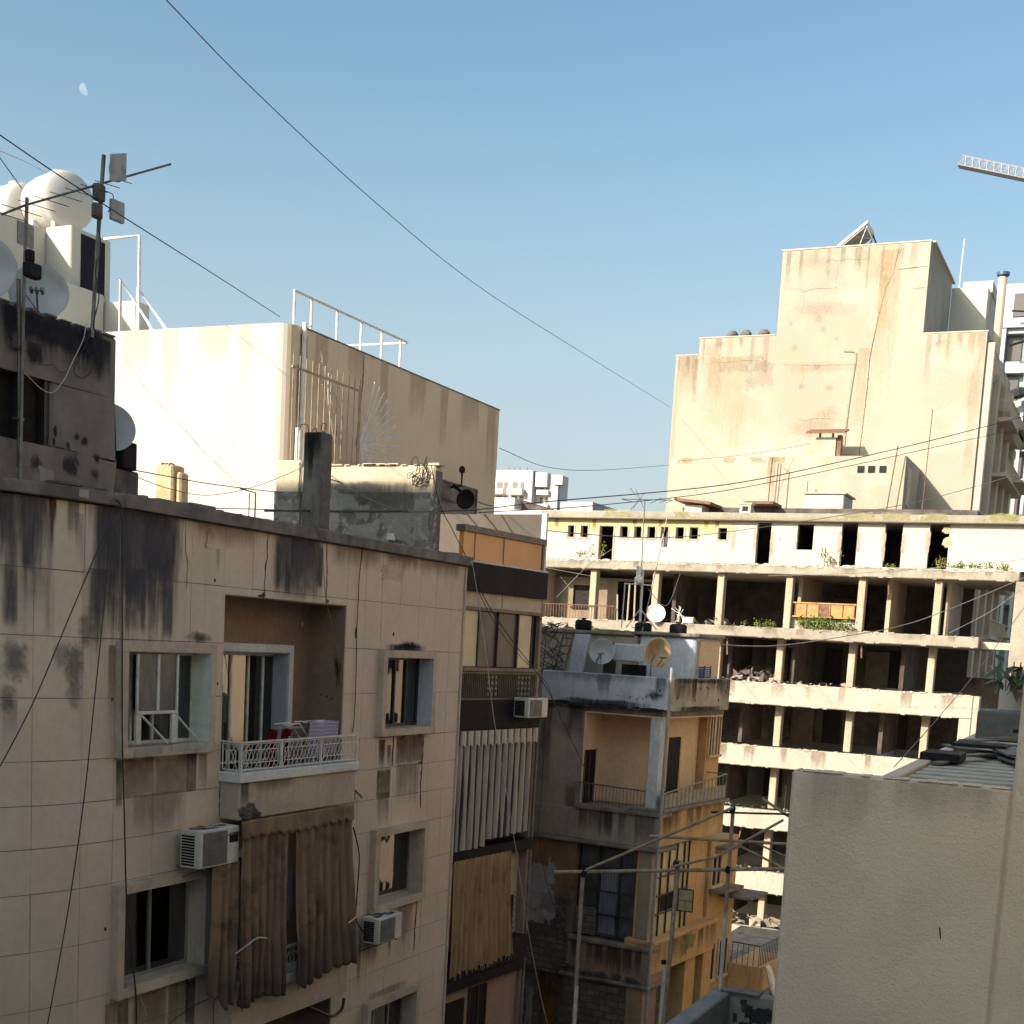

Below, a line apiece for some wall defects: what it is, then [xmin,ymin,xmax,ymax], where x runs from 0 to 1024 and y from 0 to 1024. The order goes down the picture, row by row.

leakage [2,302,110,369]
crack [799,247,925,453]
mould [64,434,87,474]
peeling [329,492,342,531]
leakage [0,492,47,620]
leakage [69,489,184,632]
leakage [276,536,323,590]
peeling [525,857,560,927]